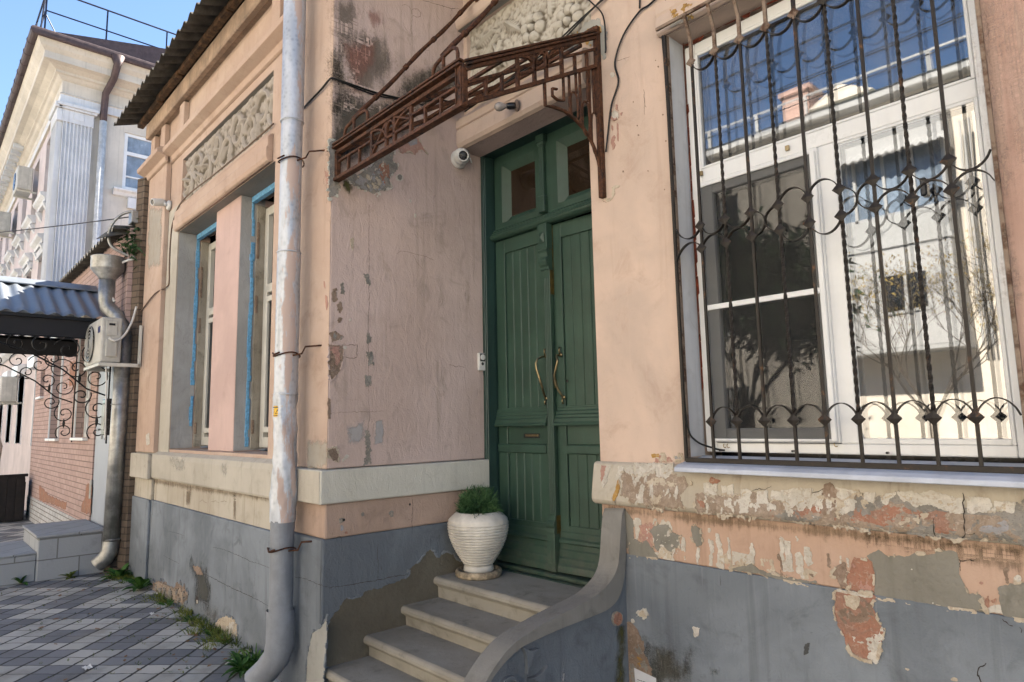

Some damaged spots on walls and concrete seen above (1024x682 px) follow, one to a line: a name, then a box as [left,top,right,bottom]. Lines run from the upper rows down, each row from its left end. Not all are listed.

water stain [328,3,389,109]
peeling [326,137,428,201]
peeling [323,281,358,382]
flaking render [152,578,198,607]
flaking render [214,614,239,640]
peeling [600,453,1024,664]